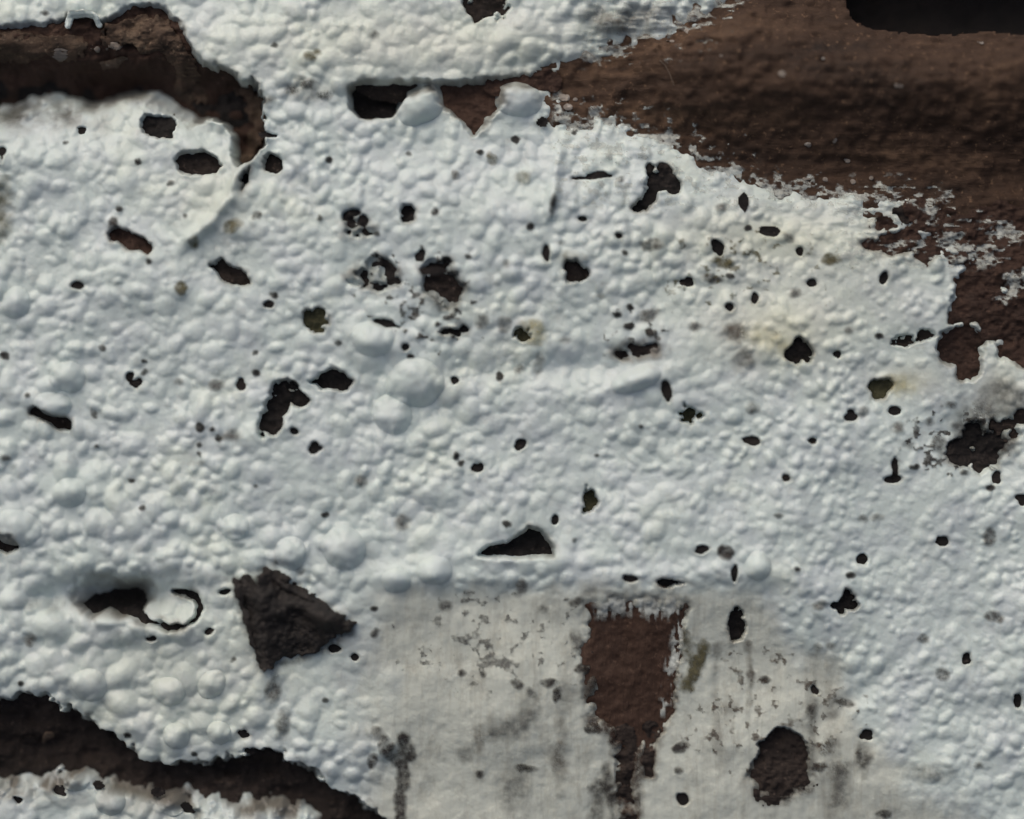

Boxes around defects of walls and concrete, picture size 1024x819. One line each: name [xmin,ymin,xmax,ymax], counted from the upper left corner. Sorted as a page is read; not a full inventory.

peeling [424,259,463,303]
peeling [861,196,1024,380]
peeling [615,343,658,359]
peeling [946,409,1024,473]
water stain [369,728,415,819]
water stain [458,633,533,694]
water stain [545,679,561,702]
water stain [584,718,622,745]
peeling [580,585,688,819]
water stain [672,738,689,752]
water stain [682,632,709,690]
peeling [750,727,818,806]